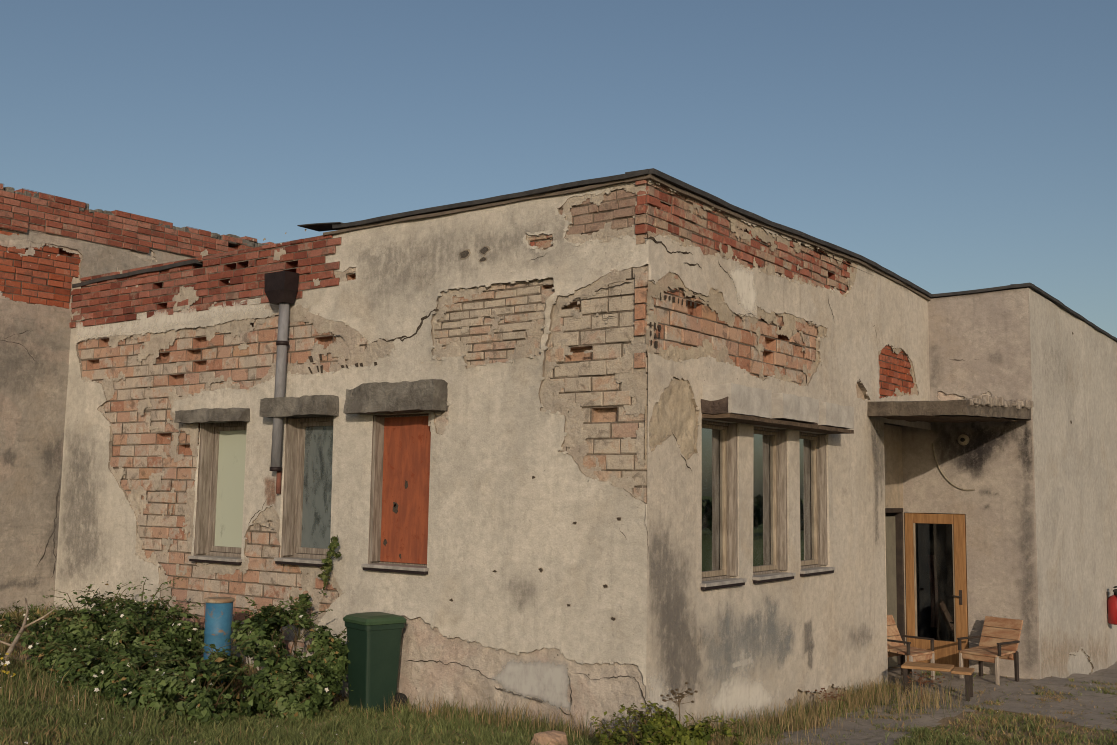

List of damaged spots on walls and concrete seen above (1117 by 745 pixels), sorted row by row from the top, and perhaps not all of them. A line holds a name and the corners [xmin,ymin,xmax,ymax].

flaking render [525,179,858,297]
flaking render [0,229,397,656]
flaking render [421,264,828,504]
flaking render [856,343,919,402]
water stain [970,428,997,468]
spalling [935,390,1034,421]
flaking render [397,615,646,737]
water stain [650,538,813,723]